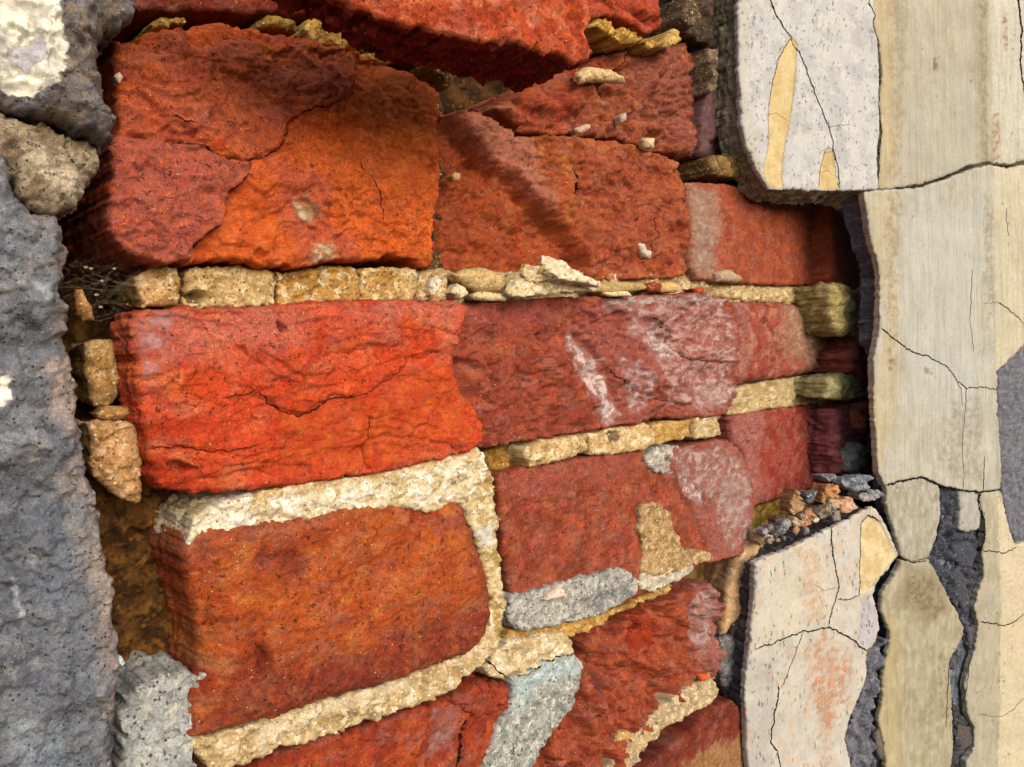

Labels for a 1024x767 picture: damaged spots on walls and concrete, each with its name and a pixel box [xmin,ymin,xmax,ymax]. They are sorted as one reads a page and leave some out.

crack [768,0,849,188]
crack [868,0,883,188]
crack [149,445,255,453]
crack [226,361,407,468]
leakage [567,336,614,422]
leakage [601,295,742,411]
crack [970,269,1023,350]
crack [755,328,1024,767]